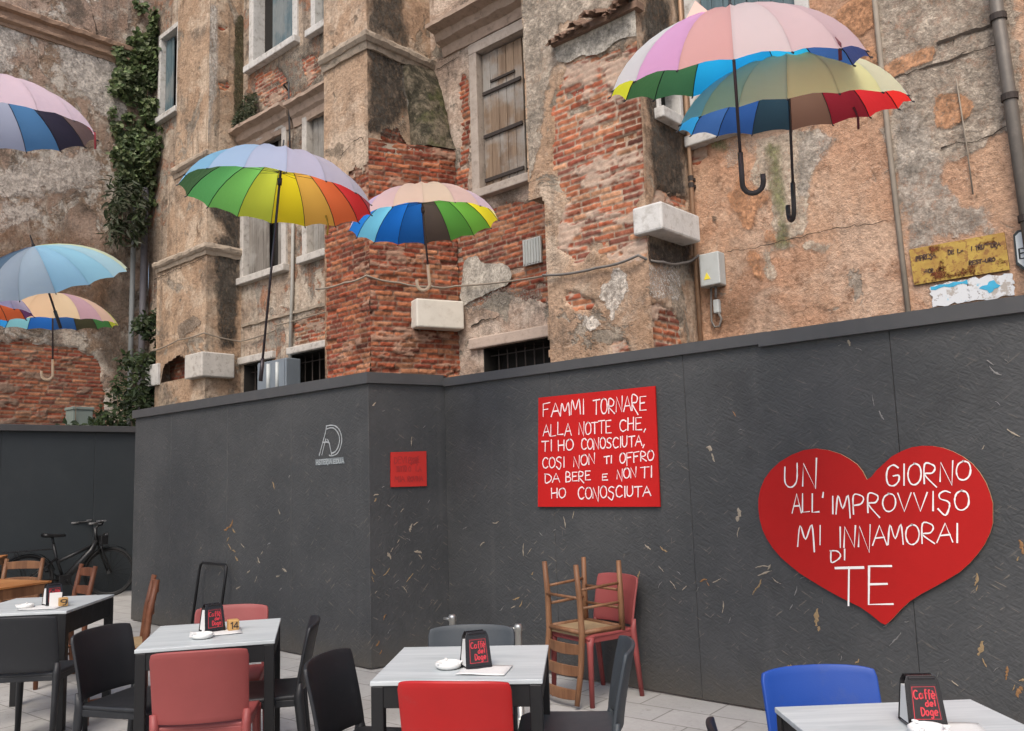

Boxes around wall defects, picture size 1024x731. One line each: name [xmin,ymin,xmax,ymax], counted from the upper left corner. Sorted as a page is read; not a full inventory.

damp [368,50,407,142]
spalling [456,0,686,311]
crack [727,220,887,252]
spalling [0,338,106,425]
spalling [610,339,629,353]